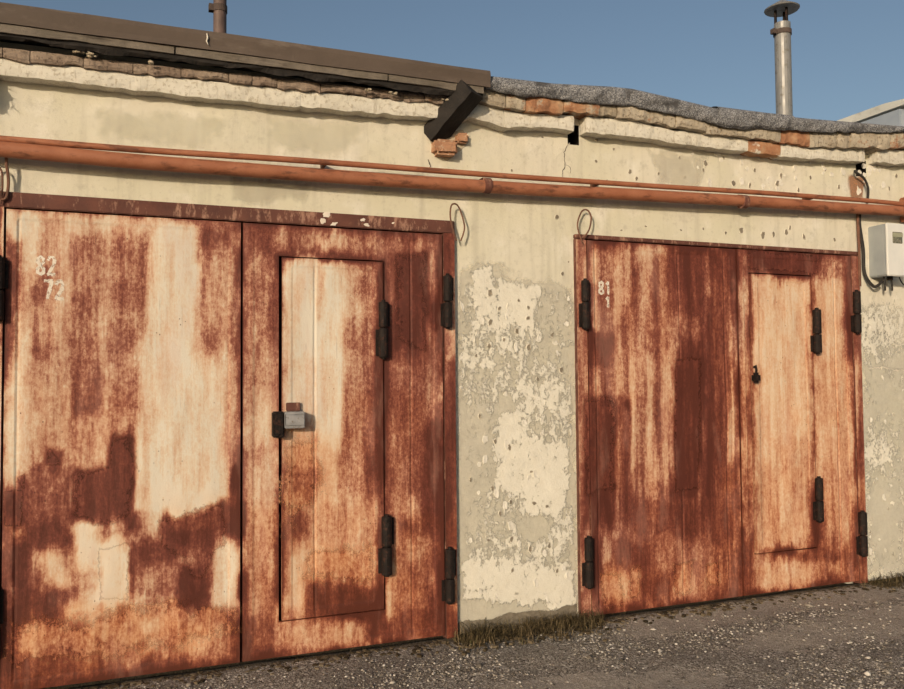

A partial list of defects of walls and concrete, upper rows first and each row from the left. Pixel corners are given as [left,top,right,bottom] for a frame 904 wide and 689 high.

spalling [428,130,469,167]
corrosion [275,428,324,539]
peeling [456,261,617,635]
peeling [861,299,904,574]
corrosion [302,544,376,588]
corrosion [600,564,642,610]
corrosion [673,559,721,595]
corrosion [3,596,238,669]